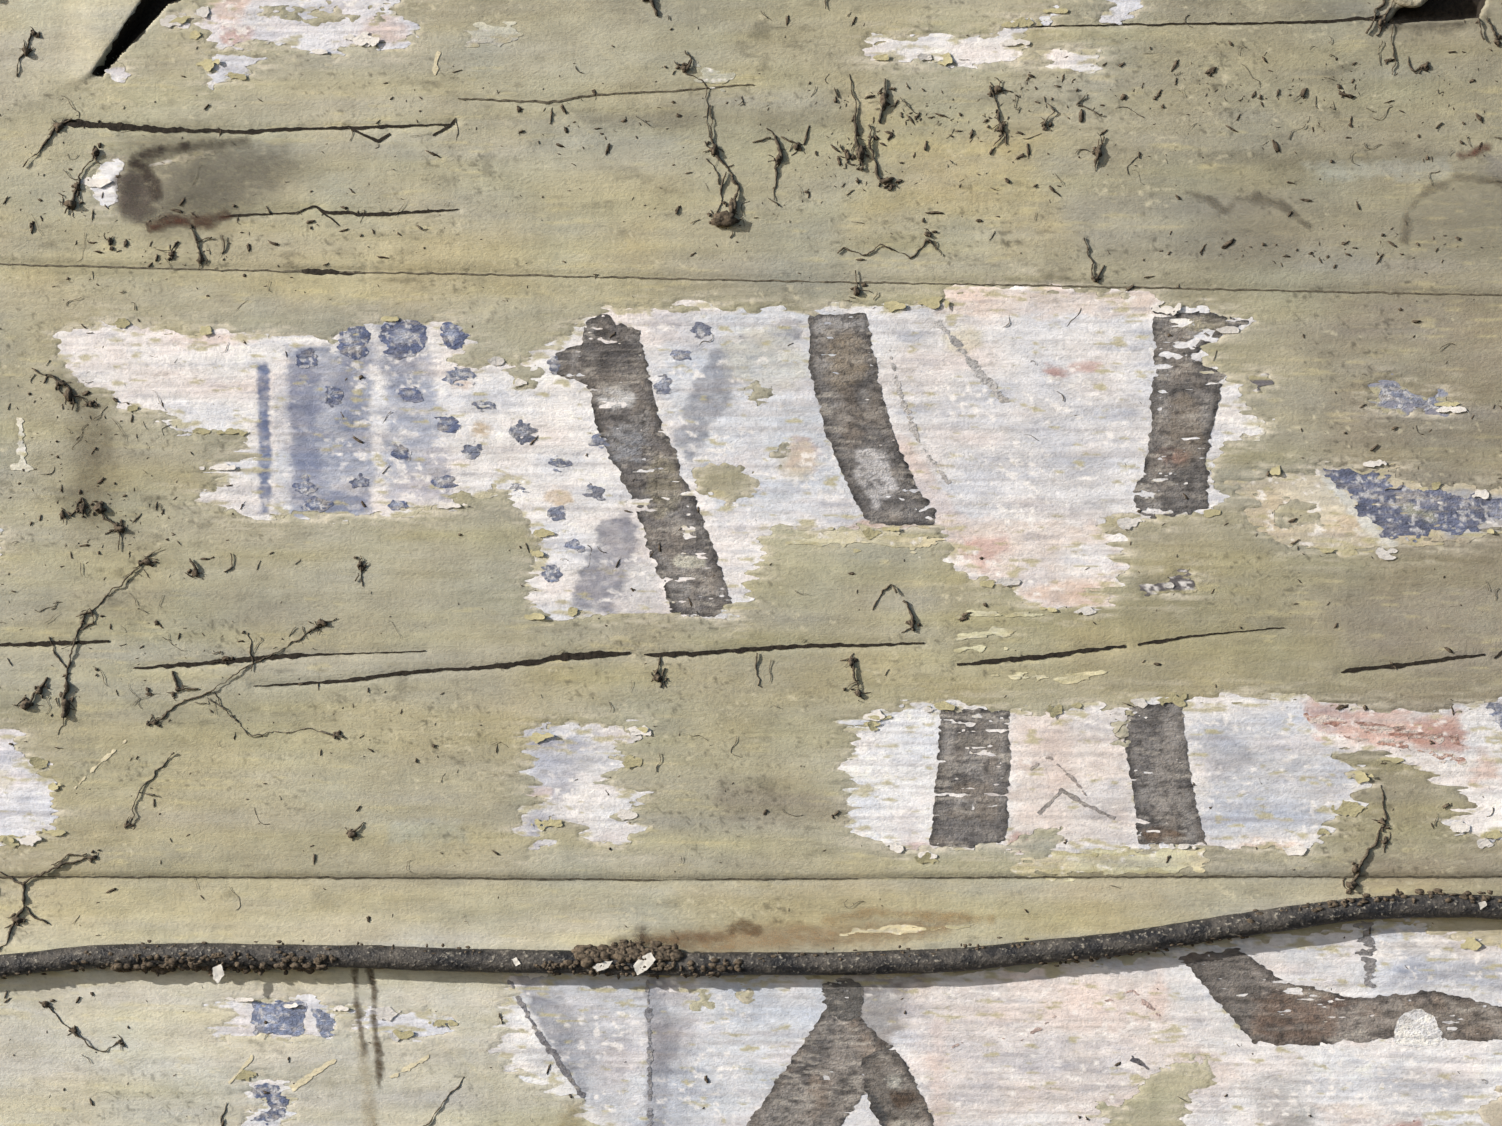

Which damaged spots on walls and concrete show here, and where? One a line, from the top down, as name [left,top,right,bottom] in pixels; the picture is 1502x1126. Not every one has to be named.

crack [92,0,178,76]
peeling [160,0,421,90]
crack [63,84,754,143]
leakage [115,139,282,231]
peeling [53,283,1502,653]
crack [135,642,925,687]
crack [957,627,1284,666]
crack [1341,650,1502,673]
peeling [0,729,66,848]
peeling [512,719,654,850]
peeling [833,692,1502,882]
peeling [488,918,1502,1126]